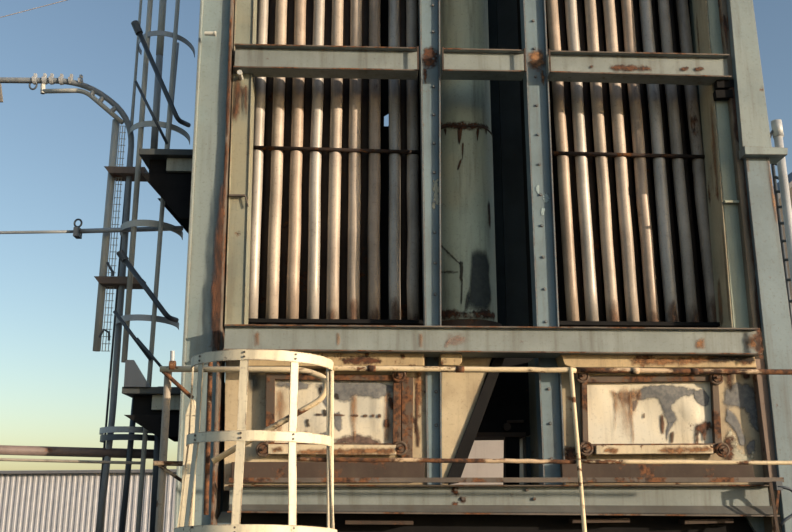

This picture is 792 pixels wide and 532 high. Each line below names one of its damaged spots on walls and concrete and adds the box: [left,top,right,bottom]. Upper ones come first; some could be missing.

corrosion [731,78,739,142]
corrosion [441,121,489,170]
corrosion [211,46,248,351]
corrosion [743,160,764,359]
corrosion [631,339,713,365]
peeling [276,381,309,390]
peeling [334,412,342,431]
corrosion [299,396,394,455]
peeling [319,381,393,405]
corrosion [614,391,640,436]
peeling [632,385,709,440]
peeling [723,383,759,461]